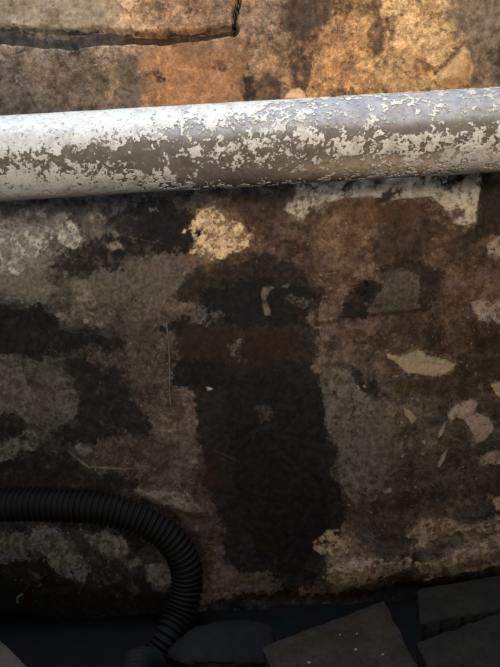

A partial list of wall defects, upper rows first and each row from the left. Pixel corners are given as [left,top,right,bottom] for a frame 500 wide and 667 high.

peeling [0,46,500,231]
peeling [91,254,182,323]
peeling [183,207,253,264]
damp [155,247,500,612]
peeling [387,347,455,379]
damp [370,178,500,350]